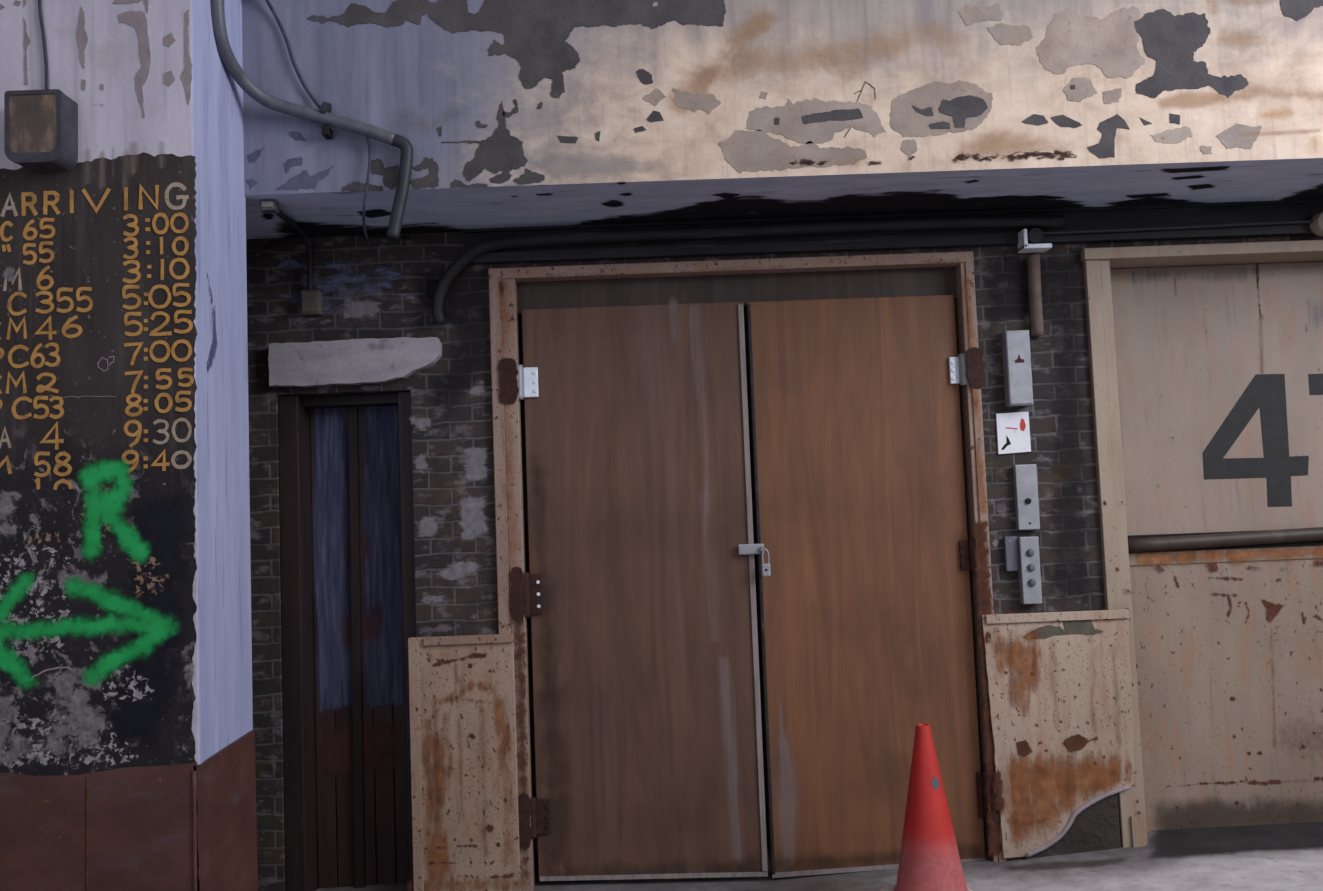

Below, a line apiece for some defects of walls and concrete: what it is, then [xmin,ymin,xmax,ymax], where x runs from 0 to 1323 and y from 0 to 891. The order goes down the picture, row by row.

peeling [1280,0,1323,21]
peeling [246,146,265,189]
peeling [276,157,333,190]
peeling [307,0,726,192]
peeling [719,80,993,173]
peeling [957,3,1262,158]
corrosion [1138,546,1323,572]
corrosion [973,443,1136,856]
corrosion [428,620,528,795]
corrosion [424,737,529,891]
spalling [1025,785,1130,858]